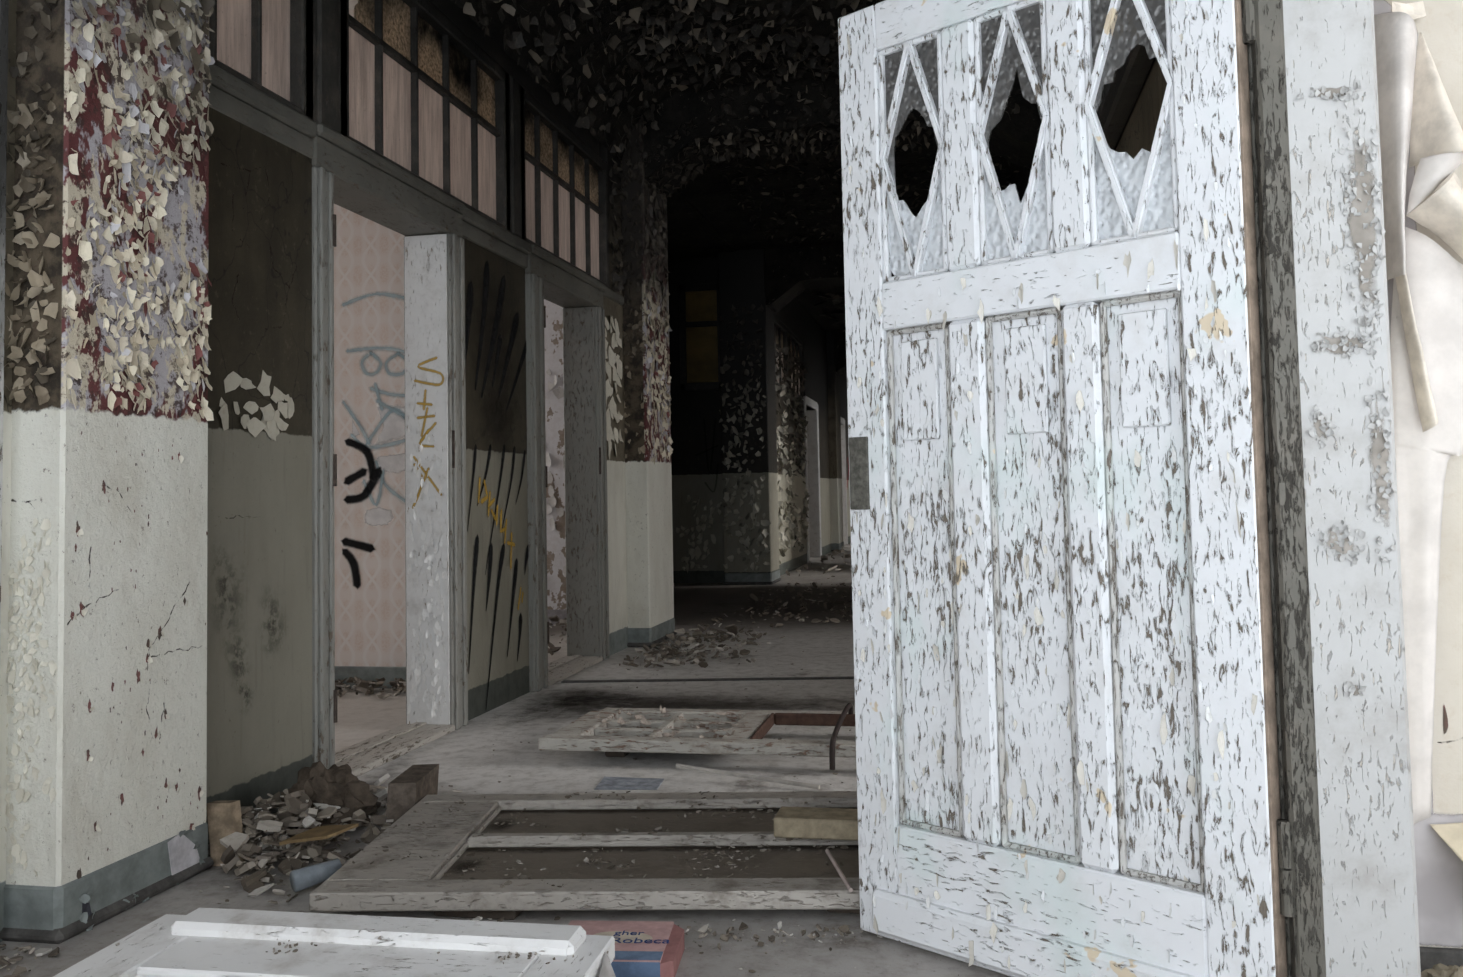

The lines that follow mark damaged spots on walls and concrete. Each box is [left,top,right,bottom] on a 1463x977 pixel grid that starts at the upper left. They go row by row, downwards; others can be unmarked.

flaking render [1373,0,1391,15]
peeling [4,0,294,441]
peeling [463,0,884,258]
peeling [989,150,1020,188]
flaking render [1405,145,1416,230]
peeling [1187,280,1236,364]
peeling [1296,80,1397,565]
peeling [546,446,565,531]
crack [67,547,117,625]
peeling [88,626,164,723]
crack [146,583,201,739]
flaking render [1414,793,1463,947]